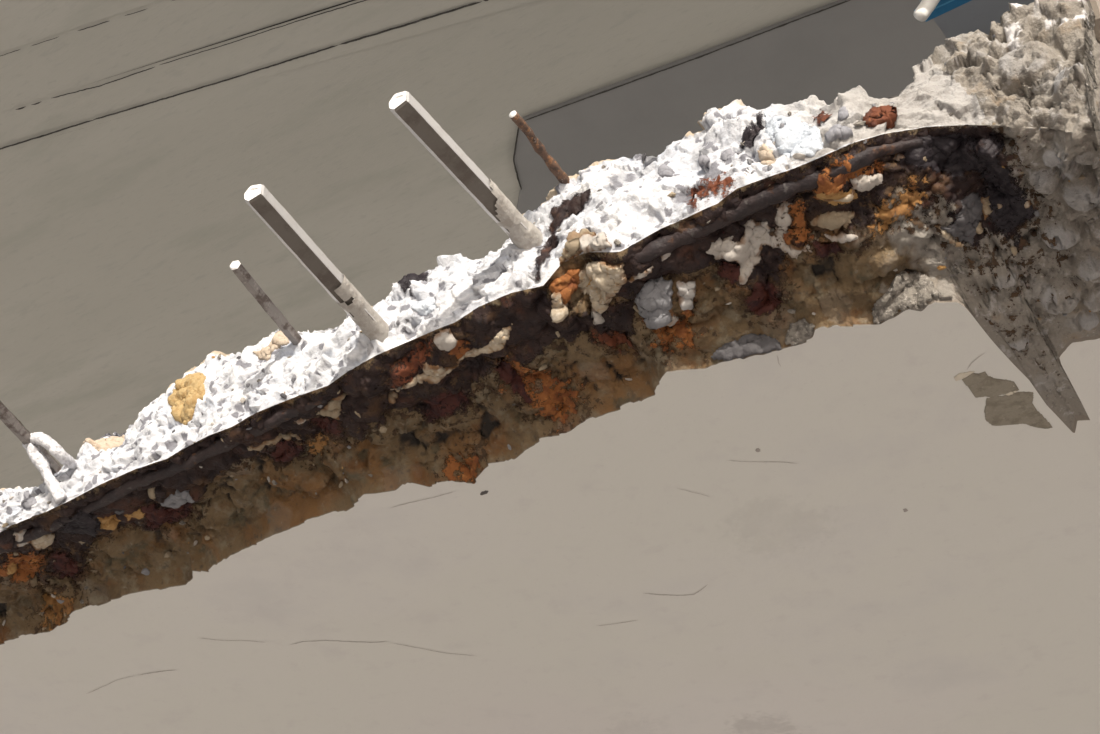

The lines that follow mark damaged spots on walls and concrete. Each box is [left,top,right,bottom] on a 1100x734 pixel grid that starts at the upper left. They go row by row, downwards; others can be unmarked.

crack [0,0,488,150]
spalling [0,199,965,645]
rust [0,105,1077,635]
spalling [0,0,1100,533]
crack [532,189,591,282]
crack [513,0,850,190]